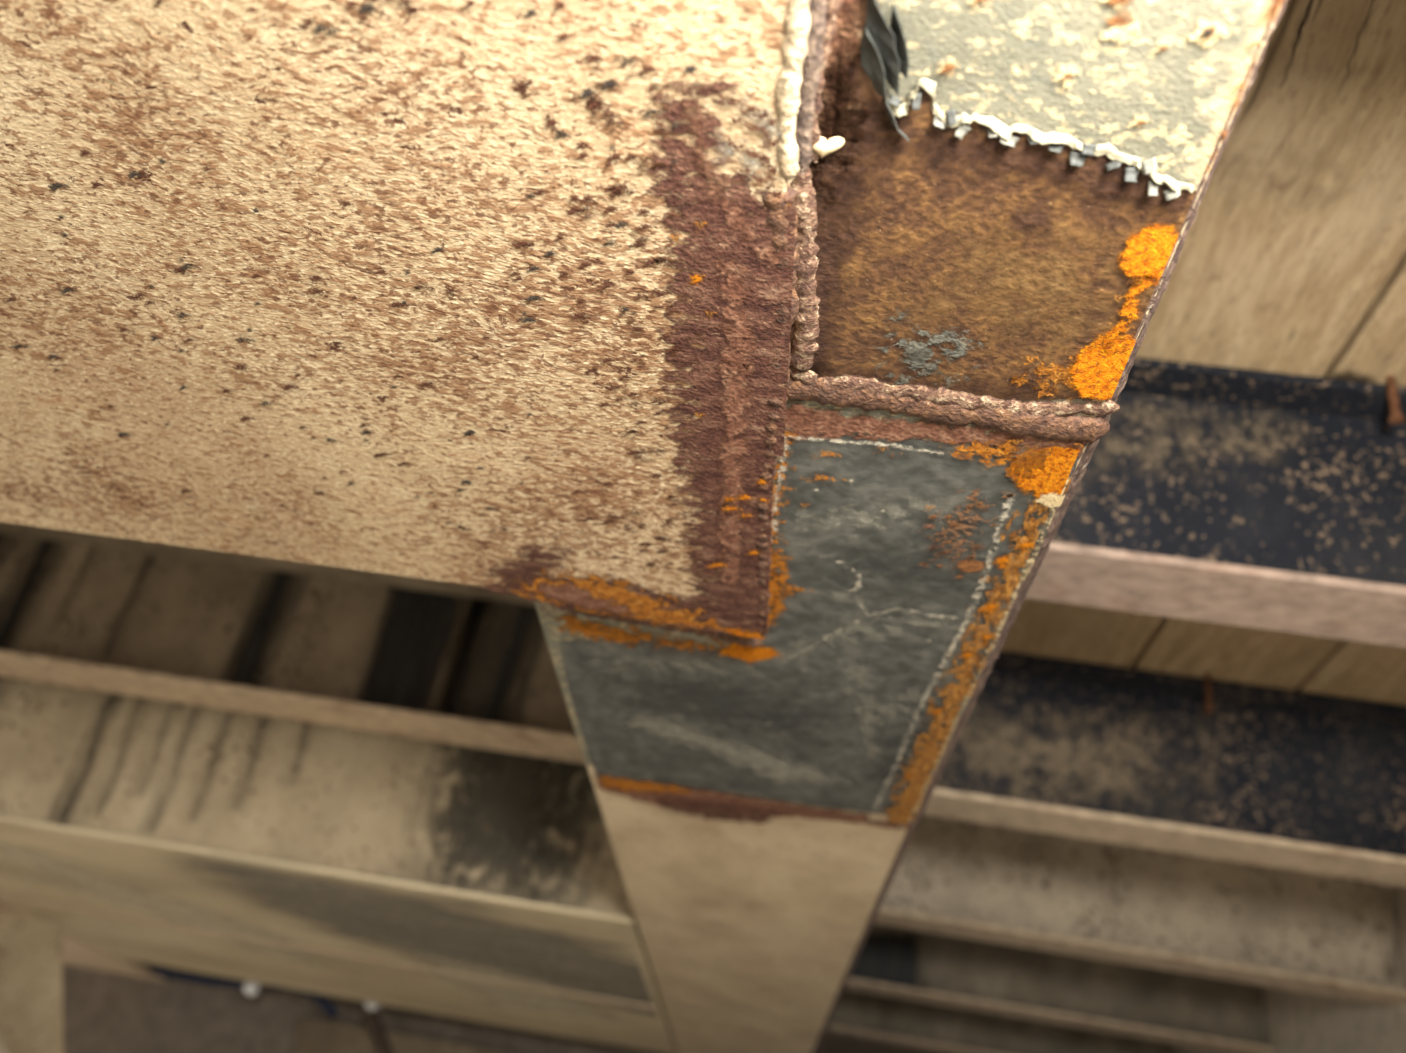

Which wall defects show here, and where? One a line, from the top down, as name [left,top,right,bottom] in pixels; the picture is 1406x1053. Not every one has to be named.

rust [1186,18,1238,48]
peeling [861,0,1194,201]
rust [308,275,329,298]
rust [388,271,457,311]
rust [239,373,301,422]
rust [468,0,1197,831]
damp [1333,372,1371,383]
rust [359,424,412,466]
damp [959,706,1161,806]